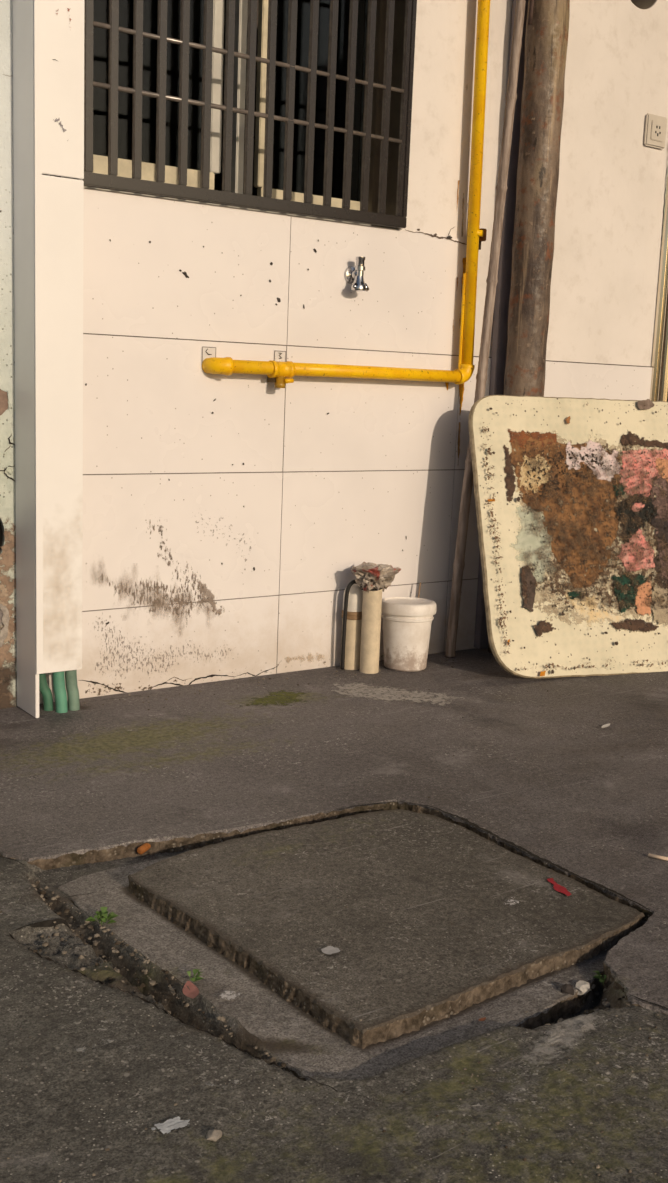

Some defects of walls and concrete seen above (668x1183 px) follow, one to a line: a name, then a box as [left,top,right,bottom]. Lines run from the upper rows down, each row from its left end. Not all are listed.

crack [406,226,467,245]
spalling [0,387,9,415]
water stain [101,522,225,622]
flaking render [0,520,17,701]
crack [79,664,279,693]